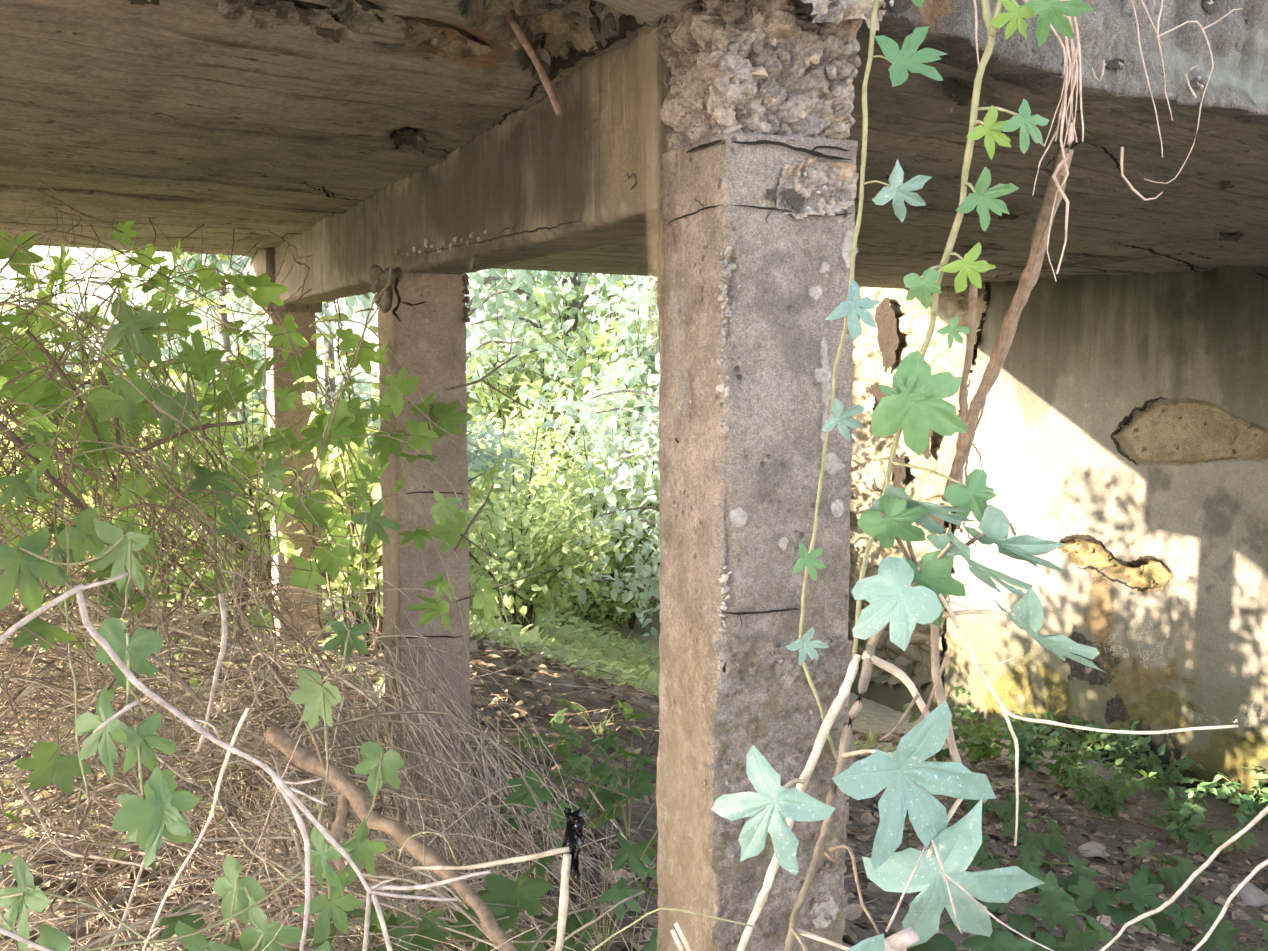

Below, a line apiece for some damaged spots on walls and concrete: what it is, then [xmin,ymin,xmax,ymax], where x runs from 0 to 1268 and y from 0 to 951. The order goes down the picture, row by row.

spalling [801,0,915,31]
spalling [228,0,646,116]
crack [686,140,851,160]
crack [666,199,793,226]
flaking render [1110,397,1268,466]
flaking render [1058,534,1173,593]
water stain [1063,626,1129,724]